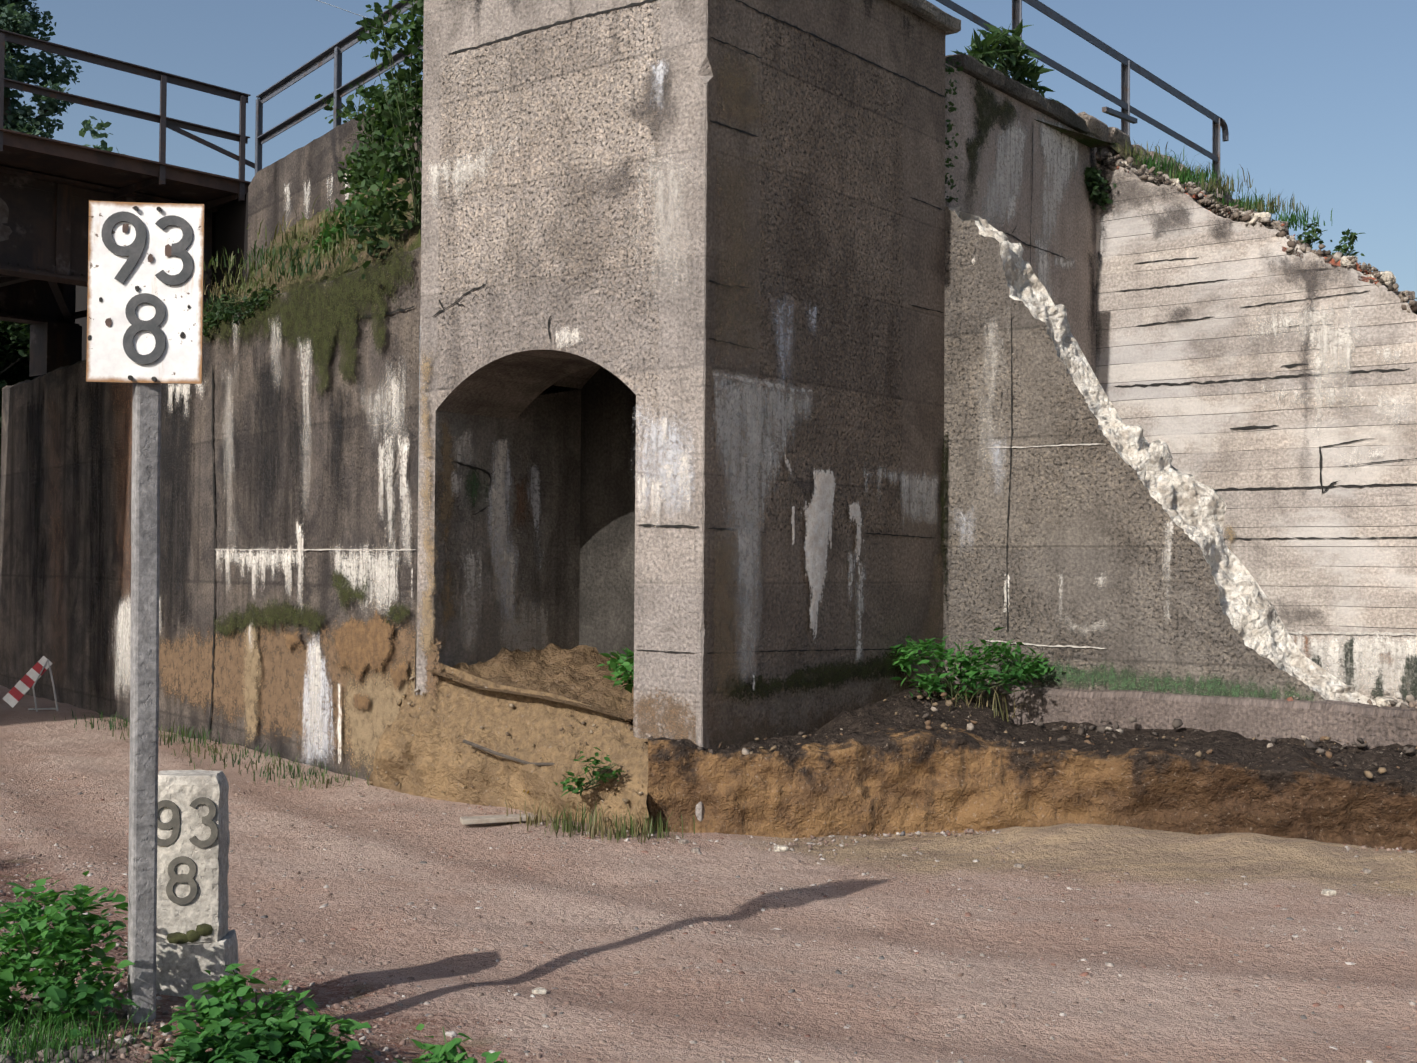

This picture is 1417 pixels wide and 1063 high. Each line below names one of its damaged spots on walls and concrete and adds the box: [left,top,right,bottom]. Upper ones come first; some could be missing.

water stain [964,137,979,187]
crack [1116,257,1370,327]
water stain [159,328,210,619]
water stain [216,280,413,624]
spalling [948,119,1376,705]
crack [1230,423,1277,431]
crack [1114,363,1407,388]
crack [1214,438,1417,493]
water stain [72,382,132,696]
water stain [461,440,540,646]
efflorescence [303,639,341,763]
water stain [1280,608,1417,690]